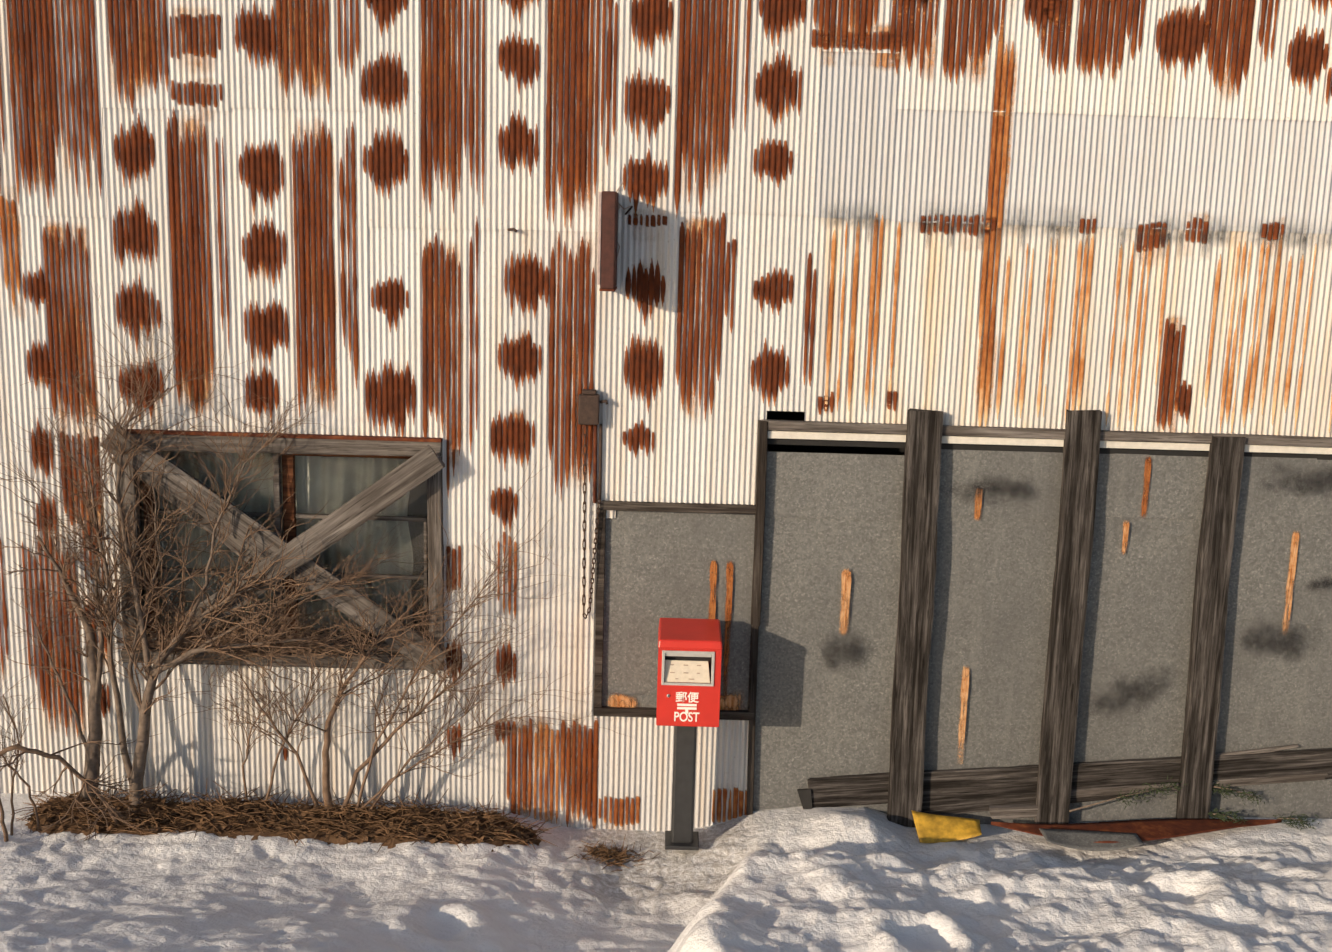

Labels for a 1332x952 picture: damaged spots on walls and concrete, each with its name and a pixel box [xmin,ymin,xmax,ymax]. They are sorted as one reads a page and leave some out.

corrosion [1025,0,1332,104]
corrosion [0,0,1058,738]
corrosion [1065,219,1096,423]
corrosion [1105,216,1317,435]
corrosion [1122,457,1151,553]
corrosion [1283,532,1299,631]
corrosion [958,667,969,757]
corrosion [495,718,640,829]